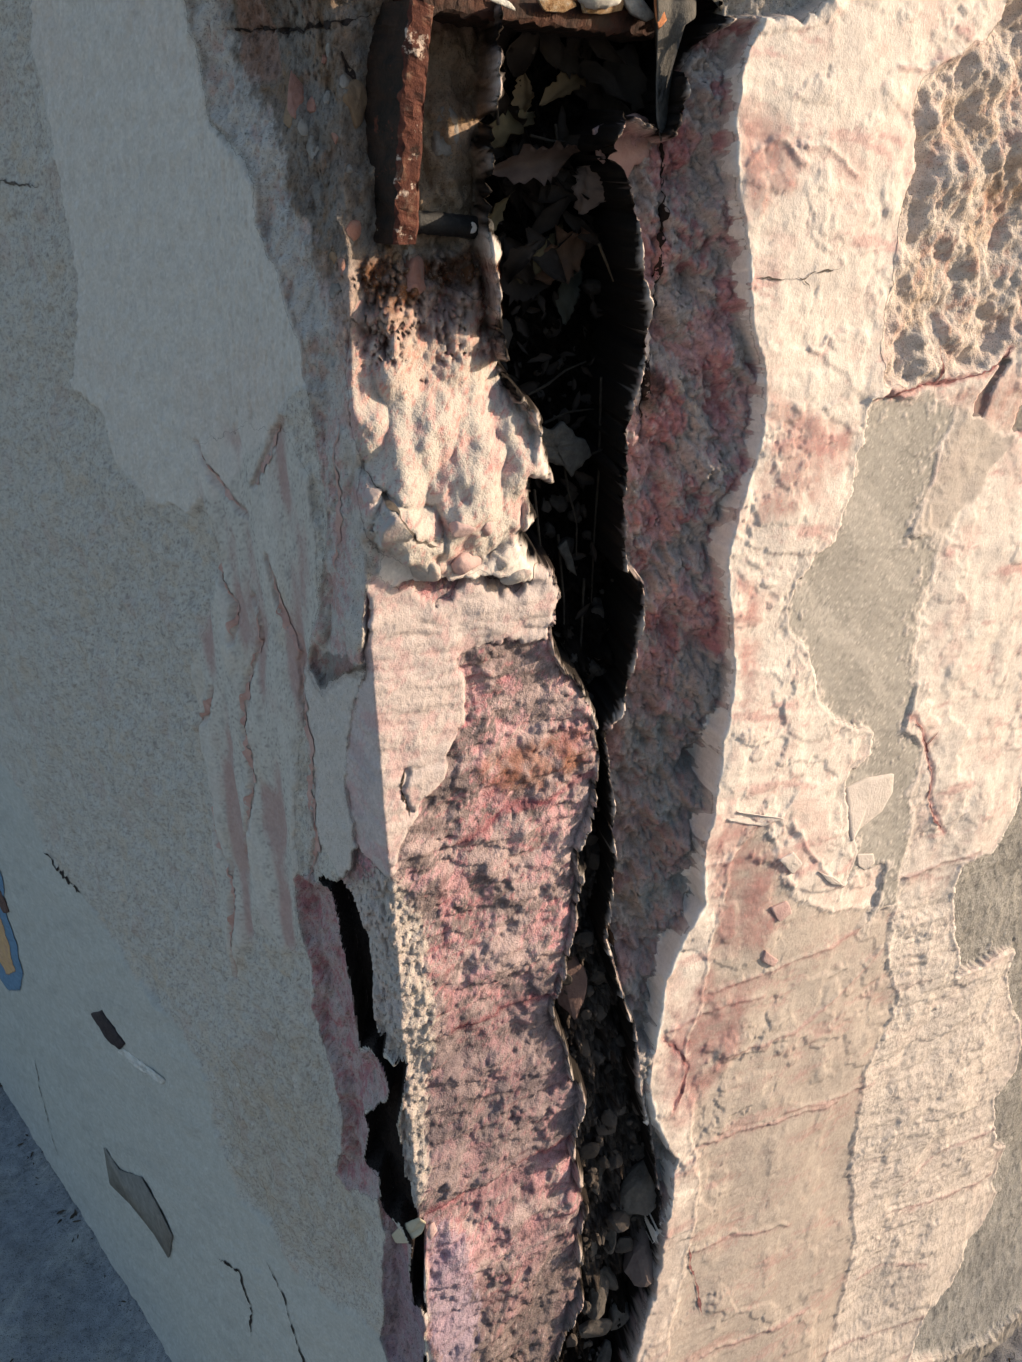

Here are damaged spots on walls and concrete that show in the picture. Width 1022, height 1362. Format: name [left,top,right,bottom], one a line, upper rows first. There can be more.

crack [0,179,37,188]
crack [234,14,372,79]
crack [400,770,410,816]
flaking render [185,0,826,1362]
crack [484,0,685,687]
flaking render [787,5,1022,924]
flaking render [104,1148,173,1258]
crack [319,875,427,1315]
crack [554,802,646,1362]
crack [665,1040,687,1105]
crack [688,1245,702,1312]
flaking render [910,787,1022,1361]